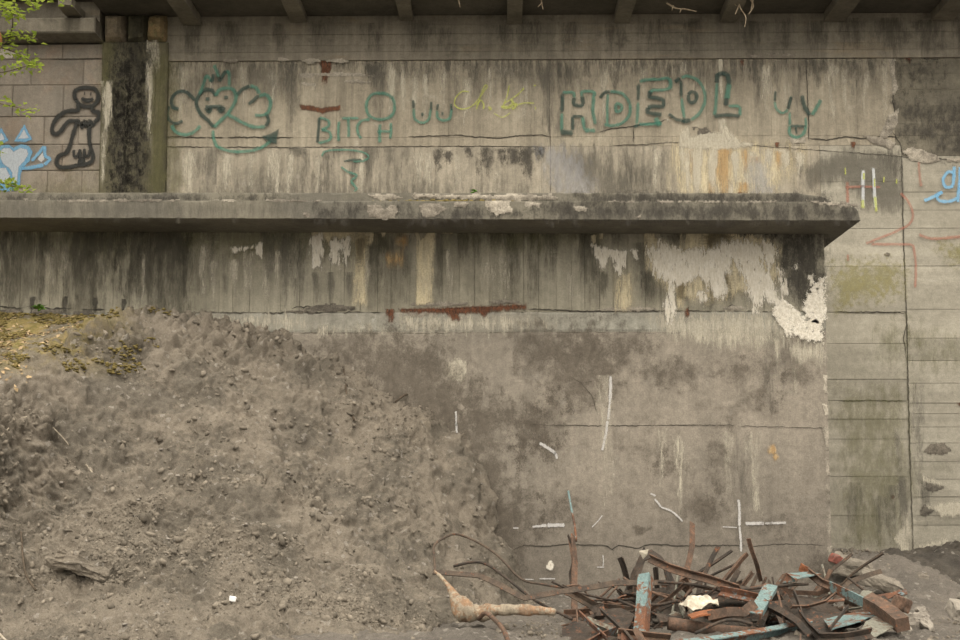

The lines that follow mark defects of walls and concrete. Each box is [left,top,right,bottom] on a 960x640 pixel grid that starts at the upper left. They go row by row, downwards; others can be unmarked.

damp [102,41,200,201]
damp [248,149,294,201]
damp [416,147,545,184]
damp [397,206,530,338]
damp [533,118,856,386]
damp [213,312,306,331]
corrosion [385,304,526,322]
peeling [591,238,828,415]
crack [514,542,822,550]